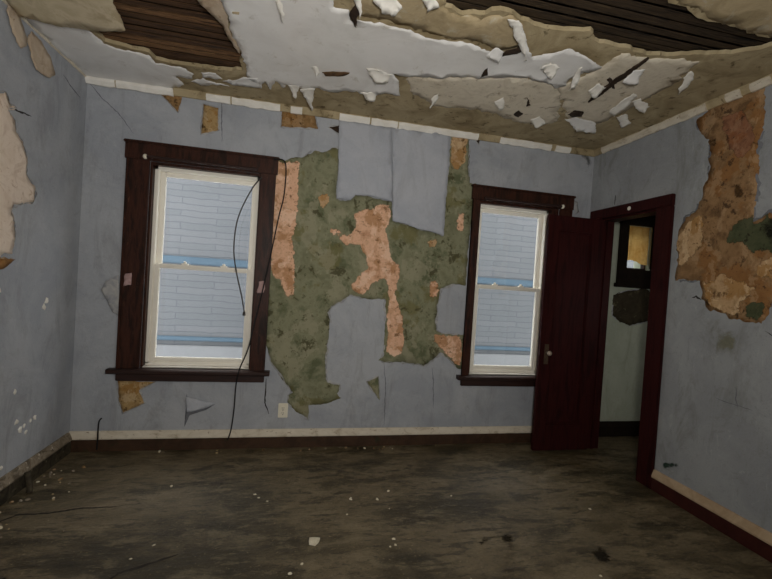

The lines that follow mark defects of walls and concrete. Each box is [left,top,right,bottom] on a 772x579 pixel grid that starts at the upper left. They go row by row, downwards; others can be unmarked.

peeling [6,0,772,134]
crack [588,57,649,103]
peeling [0,90,37,269]
flaking render [271,161,300,299]
flaking render [330,204,404,357]
flaking render [434,334,462,365]
flaking render [450,137,468,170]
flaking render [675,88,772,324]